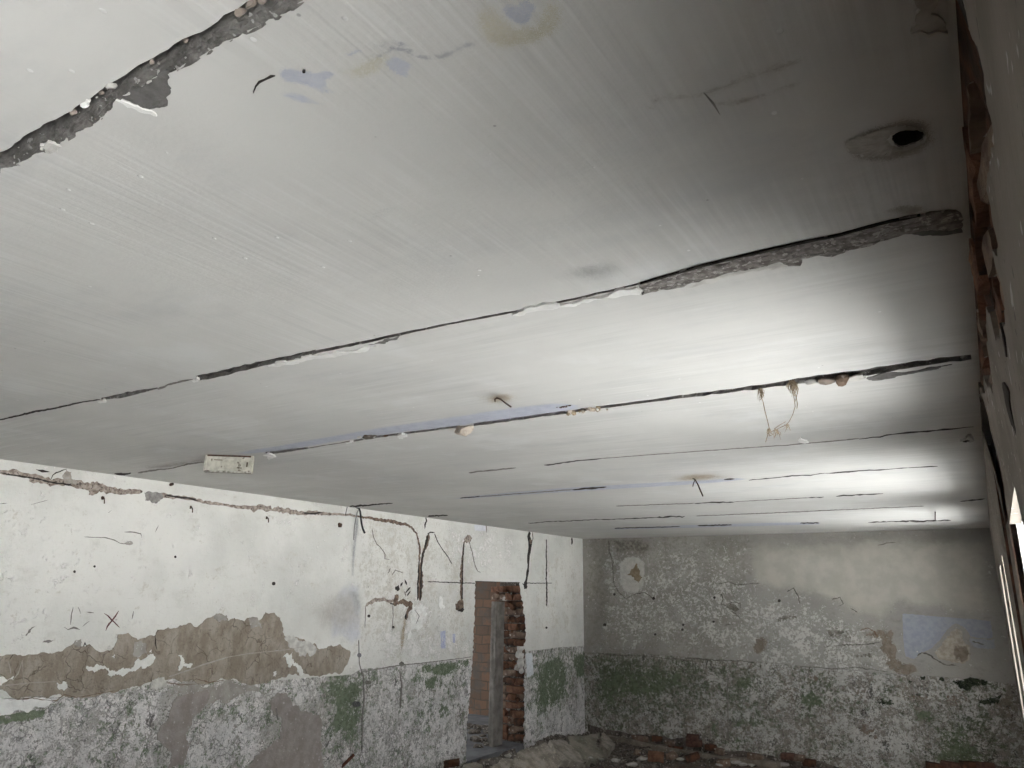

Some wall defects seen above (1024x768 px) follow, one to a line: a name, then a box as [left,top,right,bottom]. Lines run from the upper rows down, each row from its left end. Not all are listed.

spalling [0,0,304,168]
damp [253,0,566,105]
flaking render [638,0,1005,404]
crack [0,399,100,420]
spalling [62,470,107,495]
crack [114,462,204,476]
crack [427,543,481,584]
crack [522,466,983,589]
crack [546,427,968,466]
peeling [0,612,363,768]
flaking render [588,718,839,768]
peeling [827,628,1017,768]